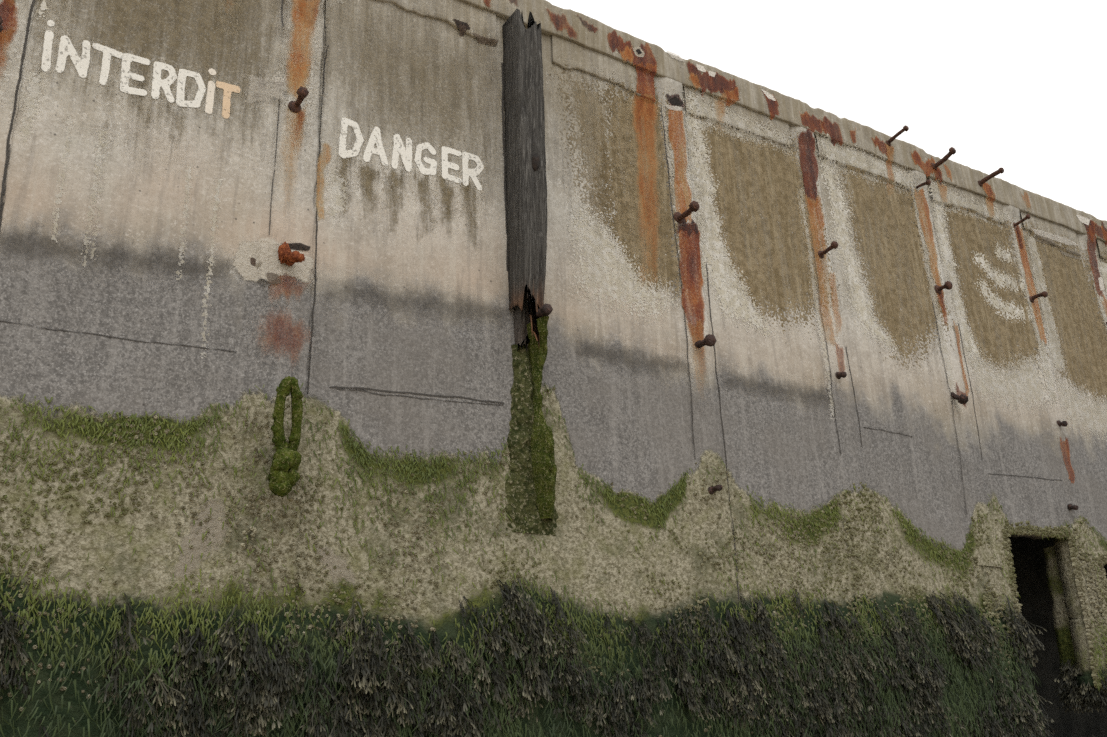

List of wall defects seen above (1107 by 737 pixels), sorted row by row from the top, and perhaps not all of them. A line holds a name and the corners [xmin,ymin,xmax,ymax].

rust [0,0,17,64]
rust [289,0,319,95]
rust [687,62,739,106]
rust [548,11,704,342]
rust [872,136,894,181]
rust [798,112,856,370]
leakage [549,66,1107,444]
rust [912,151,969,406]
rust [1085,220,1107,310]